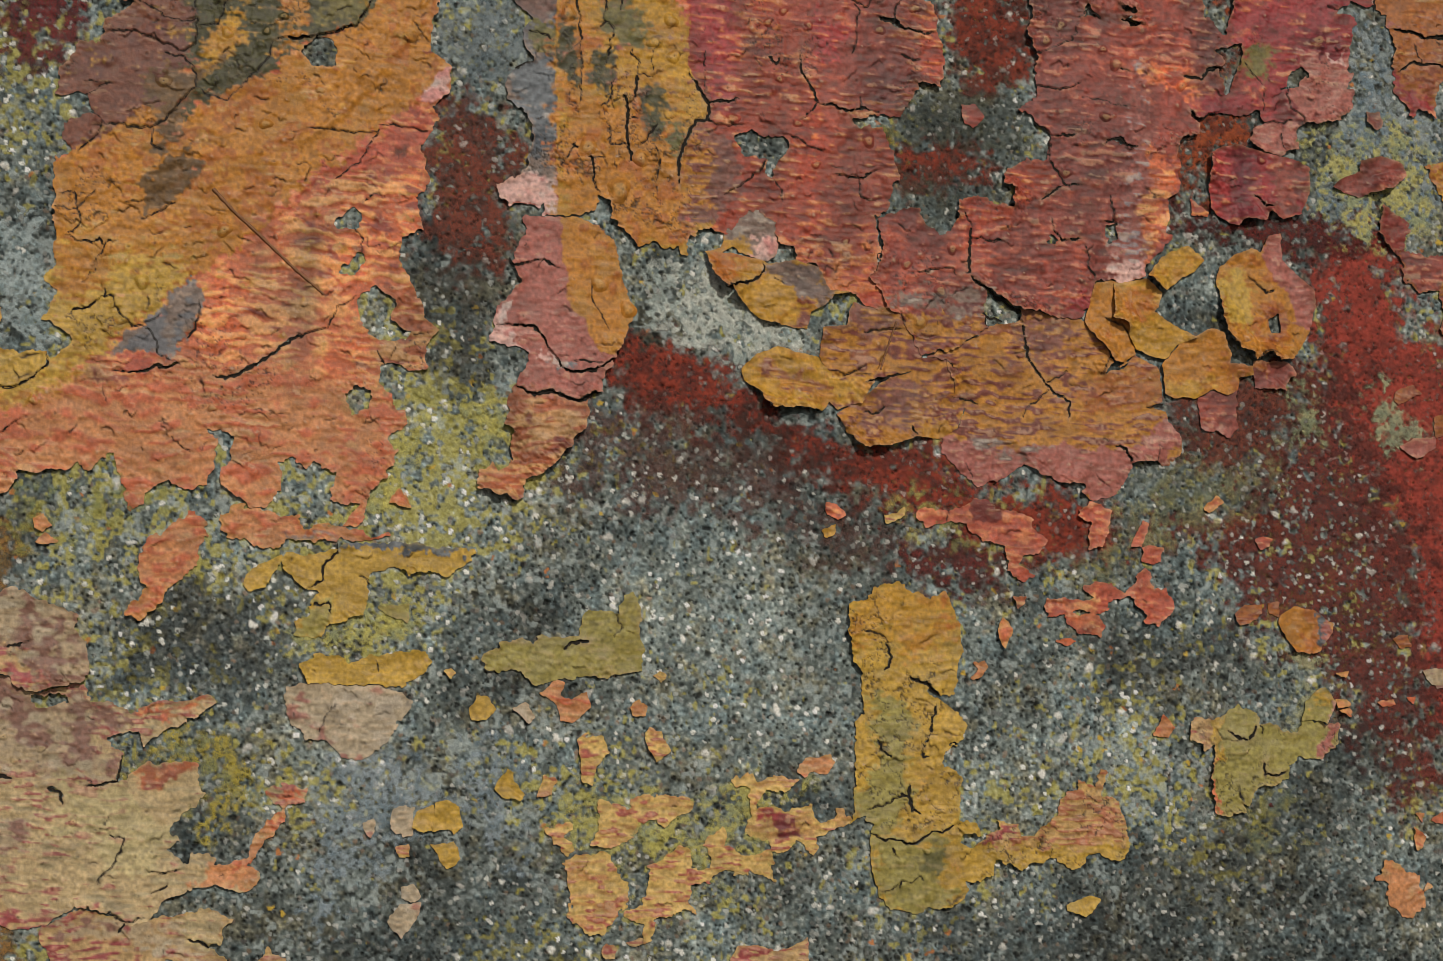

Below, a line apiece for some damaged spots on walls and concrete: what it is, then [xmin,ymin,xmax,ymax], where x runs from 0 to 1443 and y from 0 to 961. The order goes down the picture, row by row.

crack [677,71,740,183]
crack [798,51,879,115]
crack [1394,29,1443,71]
crack [62,190,141,327]
peeling [0,0,477,761]
crack [212,332,307,379]
crack [726,264,783,288]
peeling [477,0,1443,654]
peeling [0,586,308,961]
peeling [469,581,1131,961]
crack [866,630,954,889]
peeling [1153,687,1352,817]